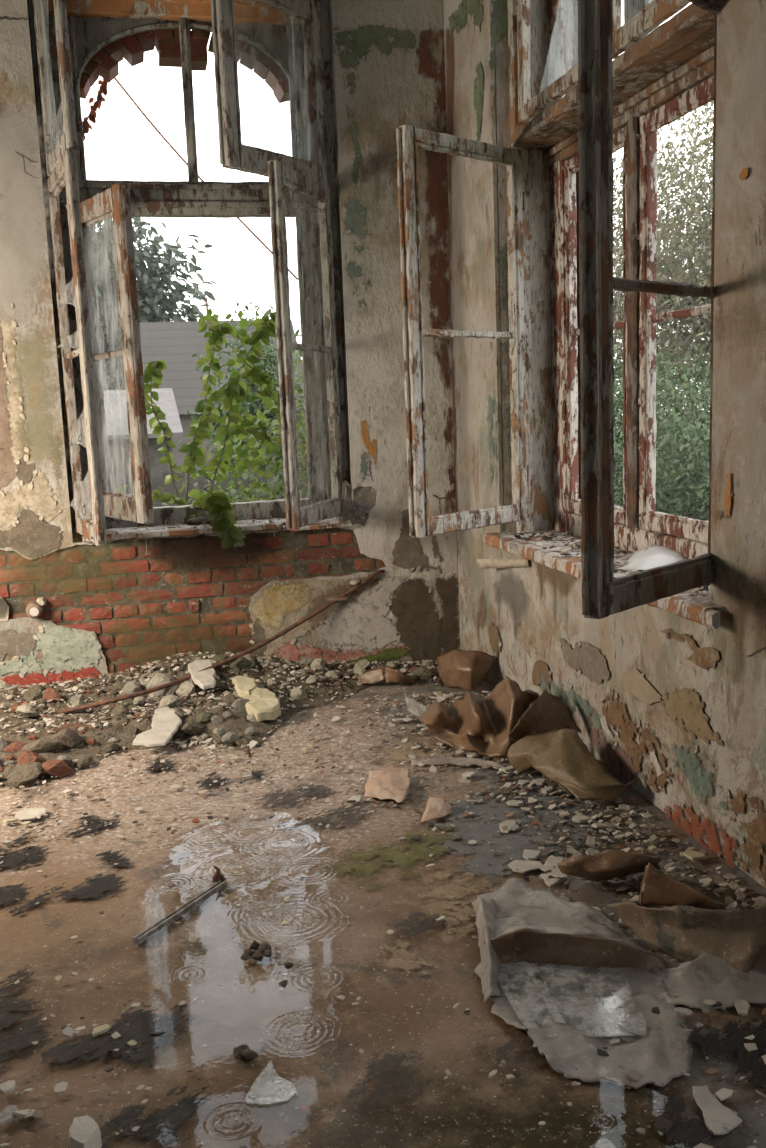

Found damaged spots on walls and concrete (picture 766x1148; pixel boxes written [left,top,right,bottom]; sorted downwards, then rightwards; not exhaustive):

peeling [334,24,416,98]
peeling [343,121,370,308]
flaking render [0,303,443,689]
damp [387,574,460,663]
peeling [532,638,766,882]